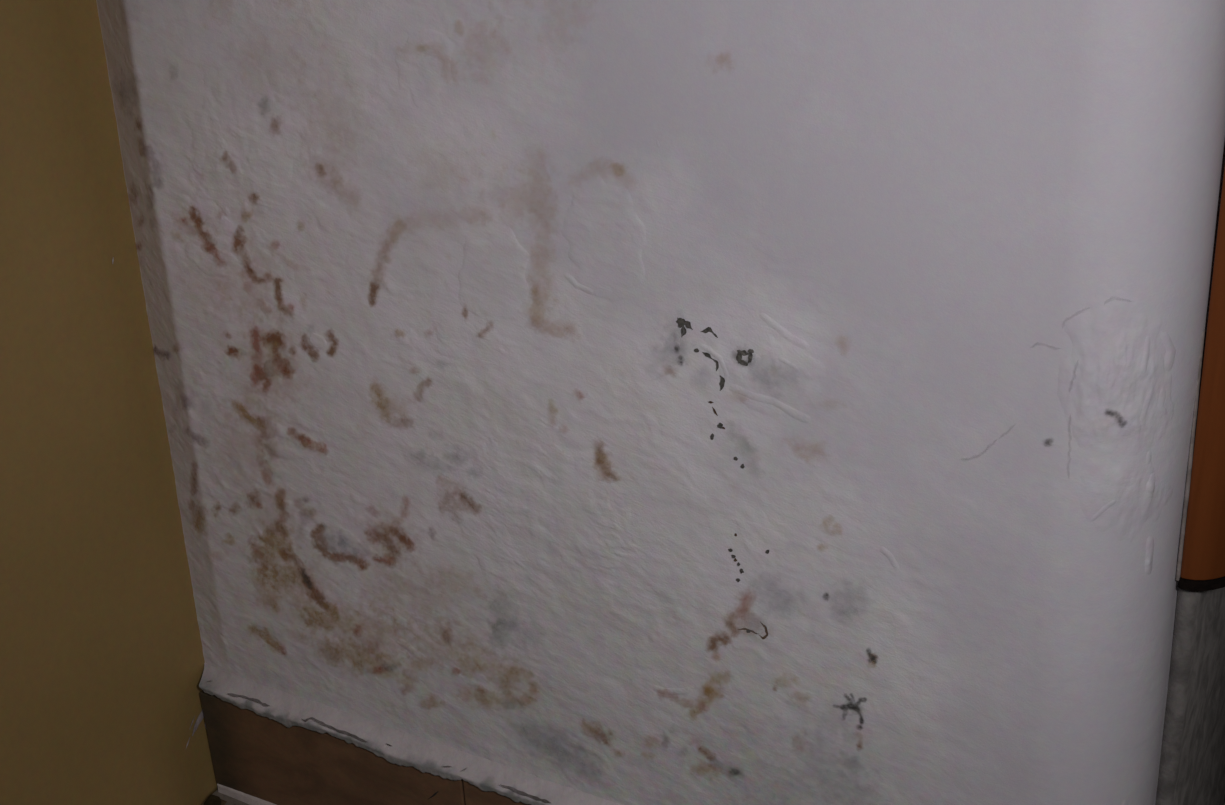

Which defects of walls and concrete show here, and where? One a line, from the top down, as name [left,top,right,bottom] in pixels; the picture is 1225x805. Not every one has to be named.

water stain [369,283,379,305]